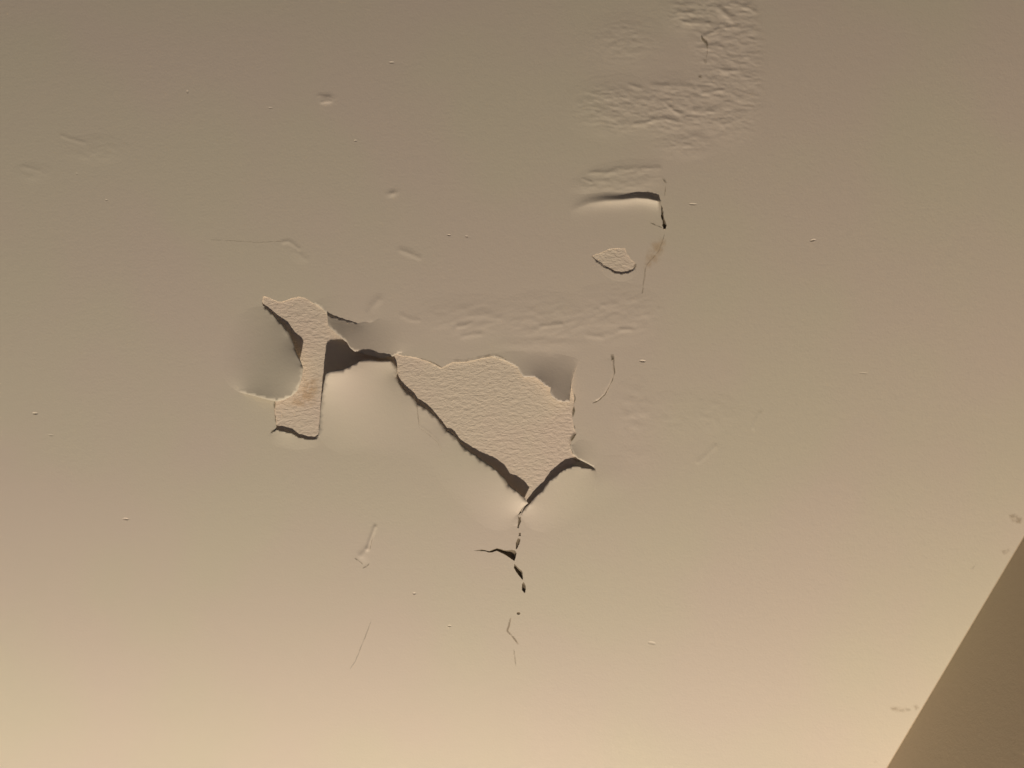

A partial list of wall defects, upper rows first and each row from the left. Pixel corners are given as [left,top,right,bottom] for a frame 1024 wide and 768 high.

peeling [592,248,637,281]
peeling [220,296,604,532]
crack [474,504,527,615]